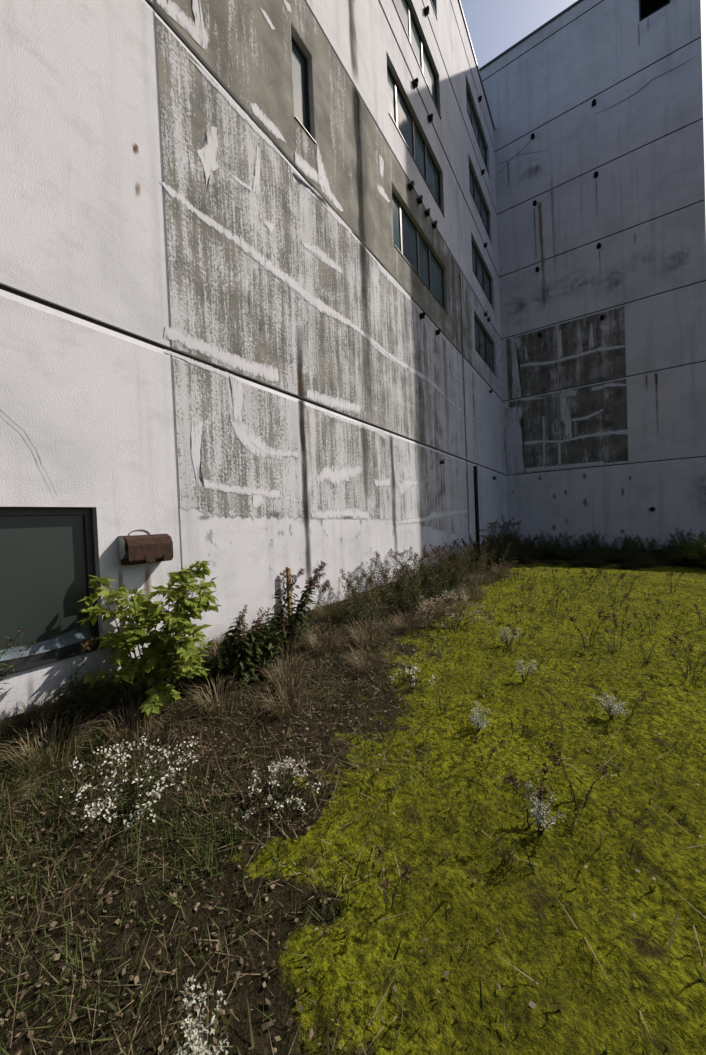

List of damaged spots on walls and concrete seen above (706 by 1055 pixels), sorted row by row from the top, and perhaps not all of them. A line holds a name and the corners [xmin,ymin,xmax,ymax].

damp [353,89,367,301]
crack [0,410,56,493]
damp [298,360,311,575]